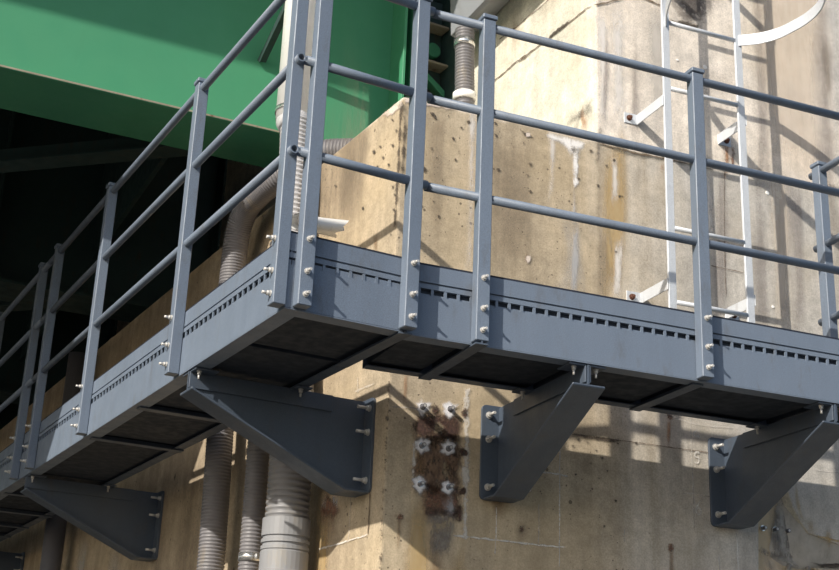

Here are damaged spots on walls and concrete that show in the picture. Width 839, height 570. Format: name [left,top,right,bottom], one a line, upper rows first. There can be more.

crack [495,0,618,80]
leakage [548,134,584,187]
rust [413,405,468,551]